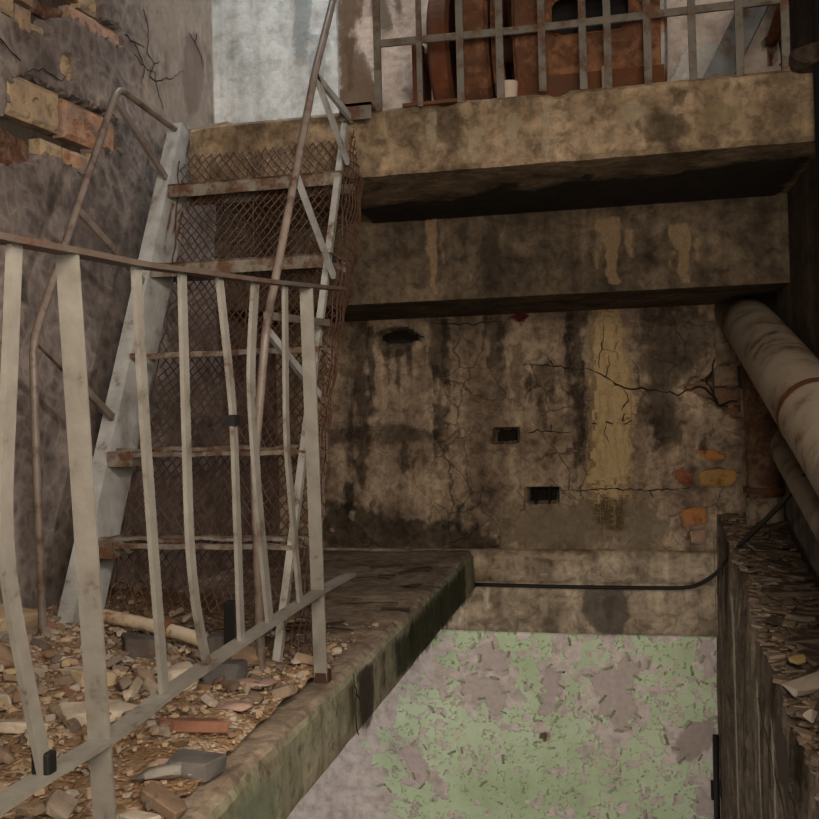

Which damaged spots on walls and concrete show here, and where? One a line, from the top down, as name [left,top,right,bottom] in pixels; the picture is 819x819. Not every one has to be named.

spalling [0,55,123,175]
spalling [0,0,126,48]
crack [124,9,204,109]
damp [322,309,670,549]
crack [520,325,737,444]
crack [562,487,689,497]
spalling [682,508,707,544]
peeling [363,630,721,819]